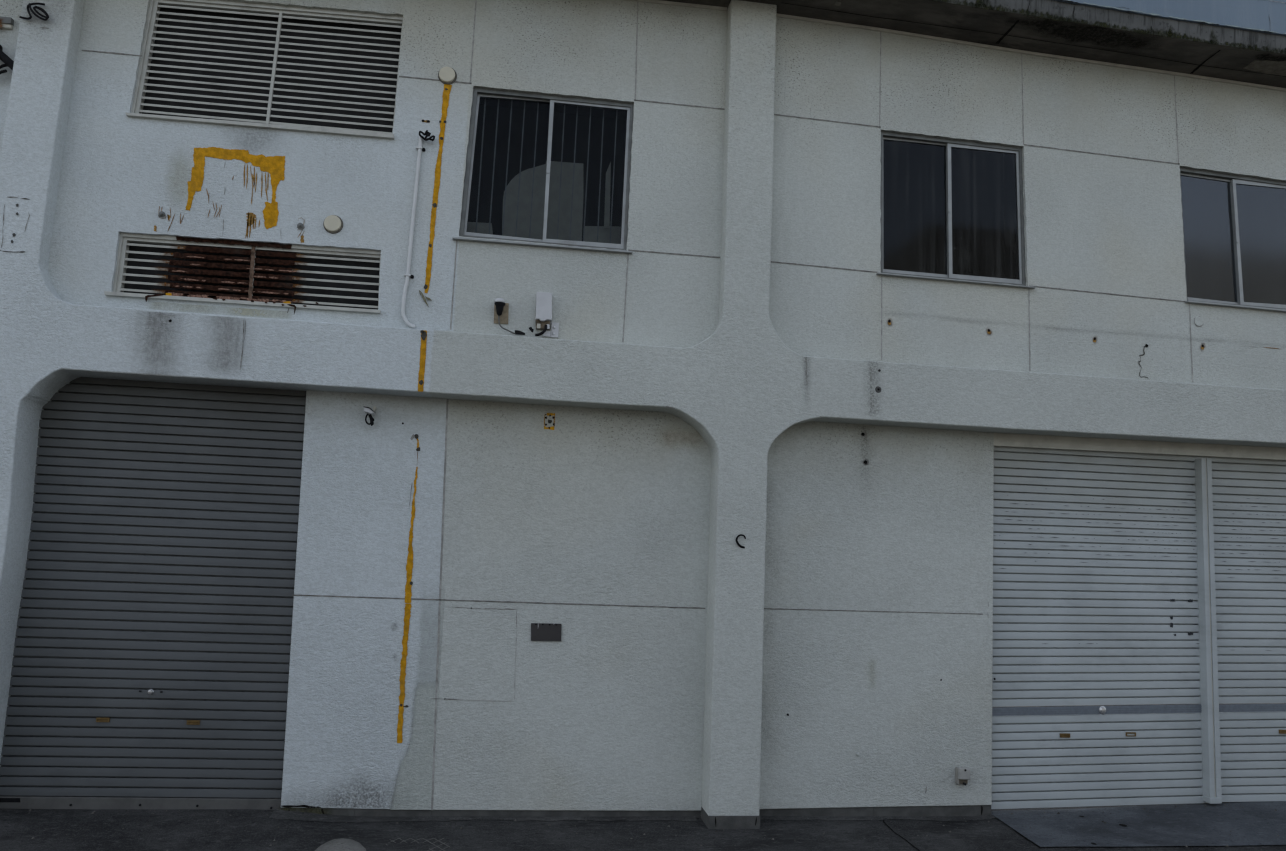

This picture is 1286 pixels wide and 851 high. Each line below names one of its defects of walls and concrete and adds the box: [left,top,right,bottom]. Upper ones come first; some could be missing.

corrosion [145,236,319,314]